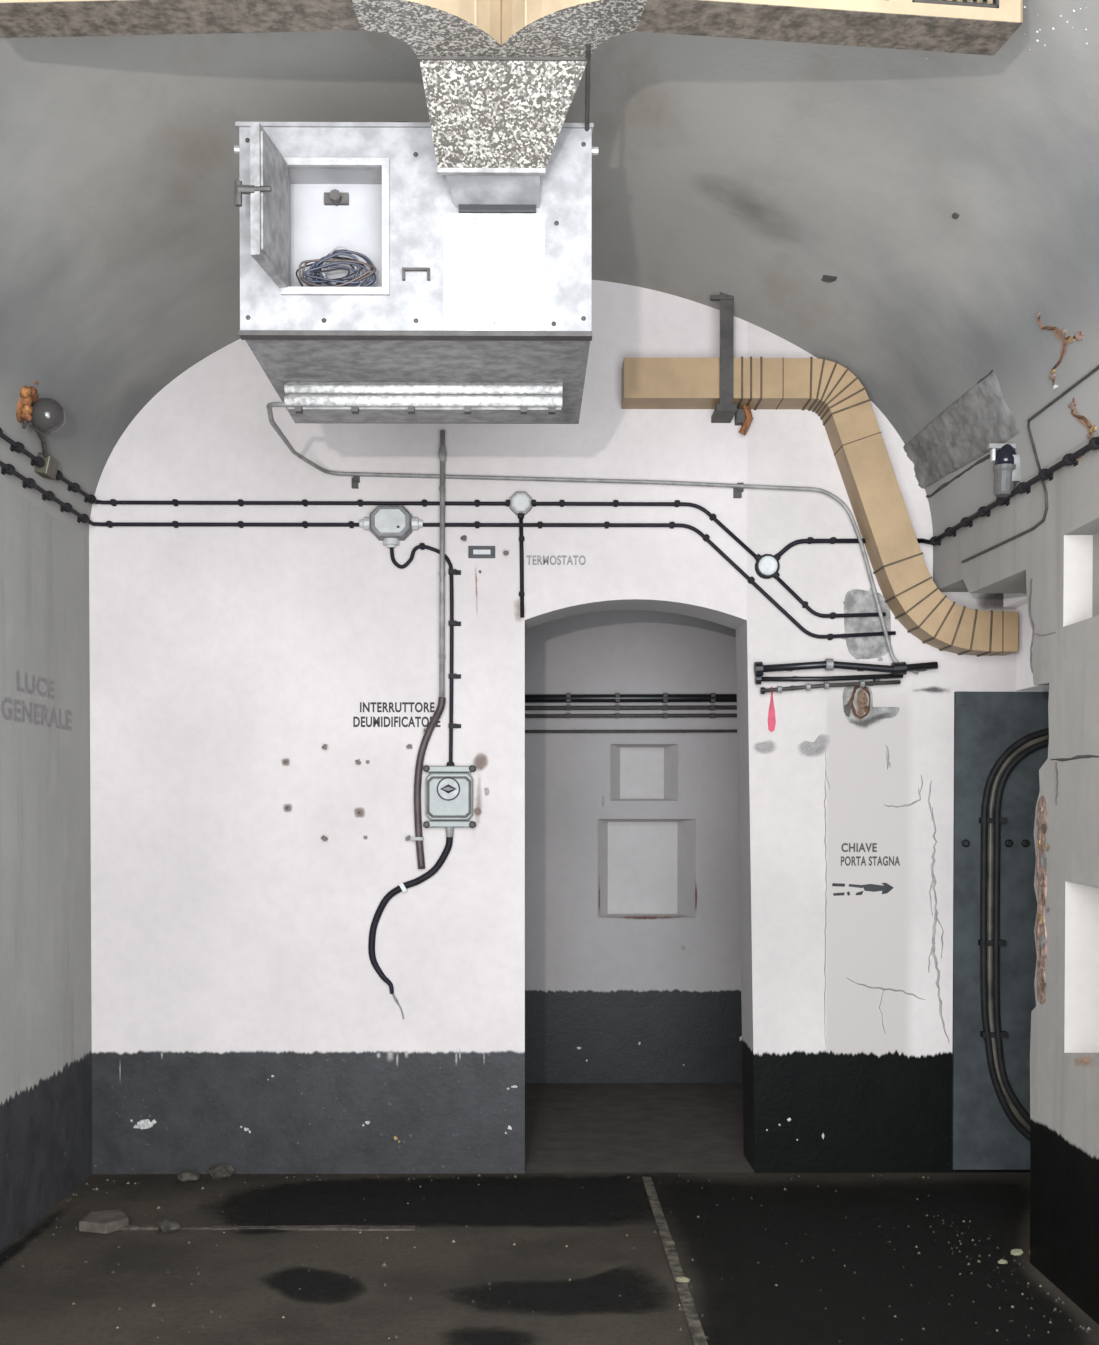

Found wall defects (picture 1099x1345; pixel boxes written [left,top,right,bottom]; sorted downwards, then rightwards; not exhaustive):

crack [884,745,892,770]
crack [824,752,949,1043]
peeling [1036,795,1049,1004]
leakage [218,1175,1081,1345]